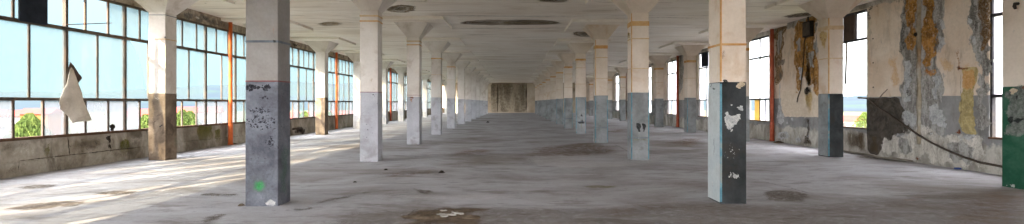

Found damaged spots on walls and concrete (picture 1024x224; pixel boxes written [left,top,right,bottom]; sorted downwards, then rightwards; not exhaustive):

peeling [724,104,743,158]
peeling [774,16,819,124]
peeling [867,0,954,135]
peeling [966,0,995,131]